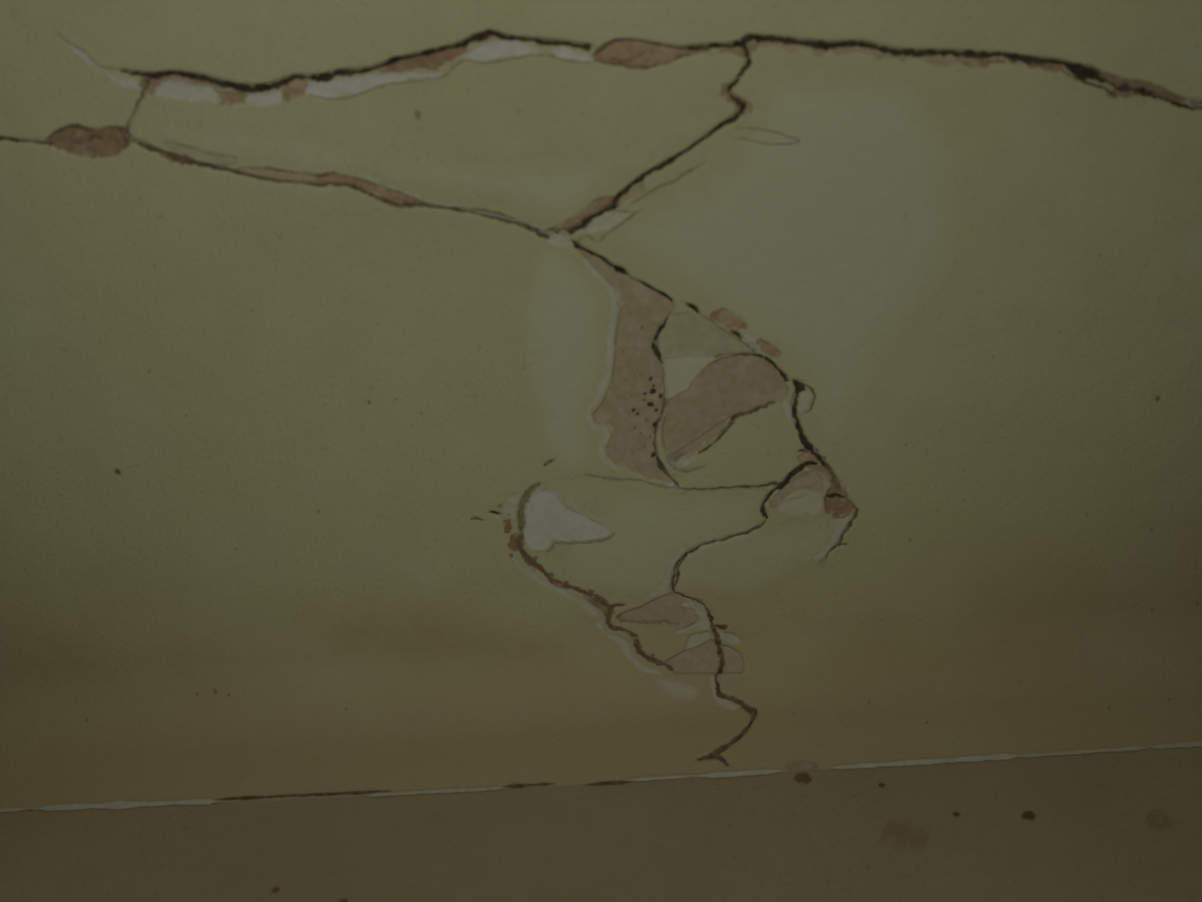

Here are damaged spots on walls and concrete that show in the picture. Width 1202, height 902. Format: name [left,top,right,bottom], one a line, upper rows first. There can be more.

crack [0,29,1202,248]
flaking render [572,241,790,485]
peeling [524,484,617,553]
crack [470,379,859,785]
crack [0,783,555,812]
crack [827,741,1202,769]